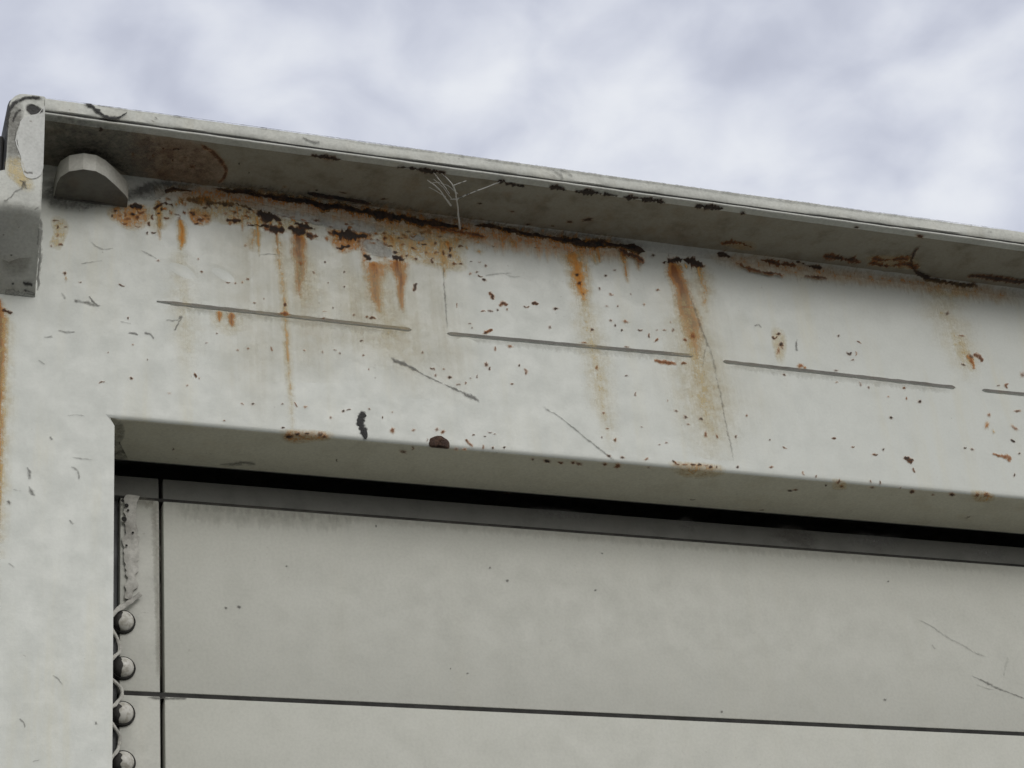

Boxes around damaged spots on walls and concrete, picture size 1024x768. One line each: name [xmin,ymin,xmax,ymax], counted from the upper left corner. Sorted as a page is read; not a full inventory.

corrosion [111,144,709,403]
corrosion [717,239,919,283]